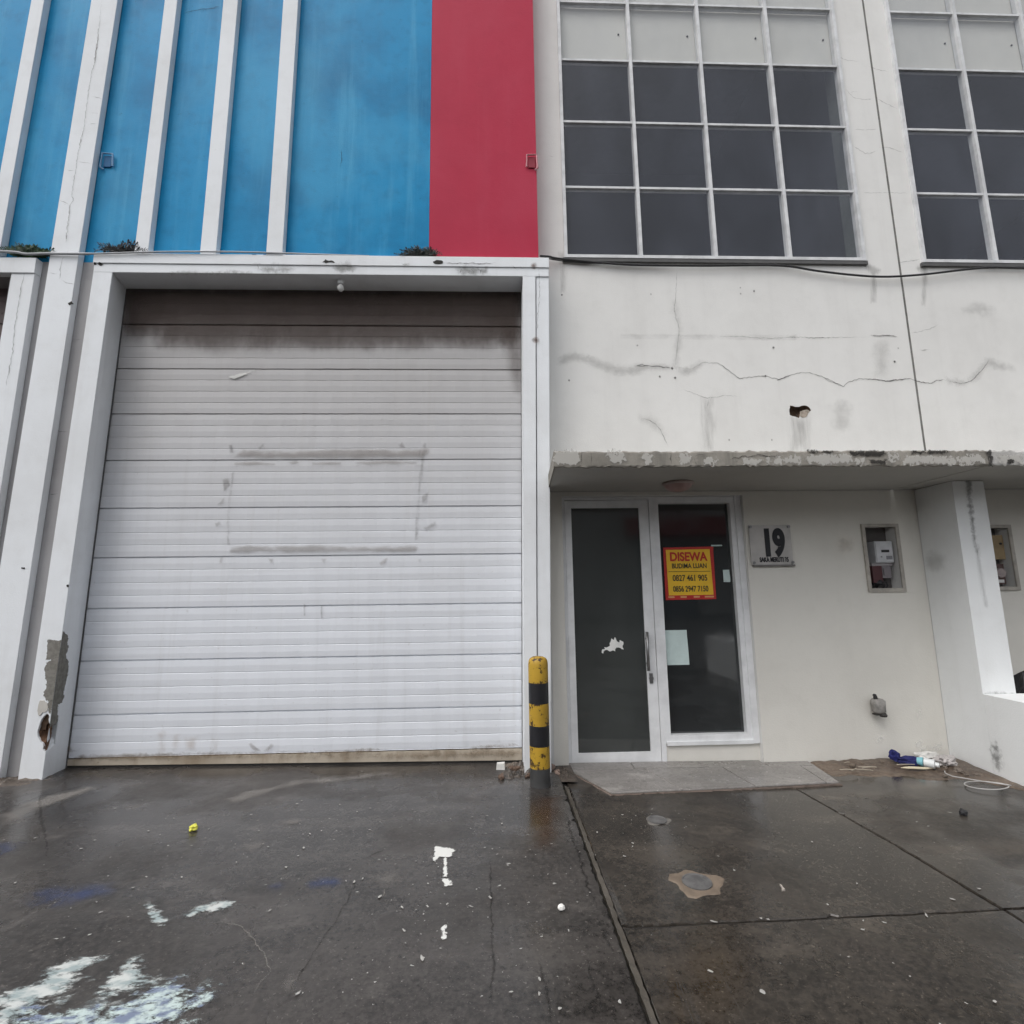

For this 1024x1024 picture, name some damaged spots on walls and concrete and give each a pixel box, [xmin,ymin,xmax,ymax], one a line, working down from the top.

spalling [789,406,811,418]
peeling [605,449,627,465]
peeling [679,452,719,467]
peeling [742,453,867,466]
peeling [887,452,985,466]
peeling [998,454,1023,466]
peeling [37,632,69,751]